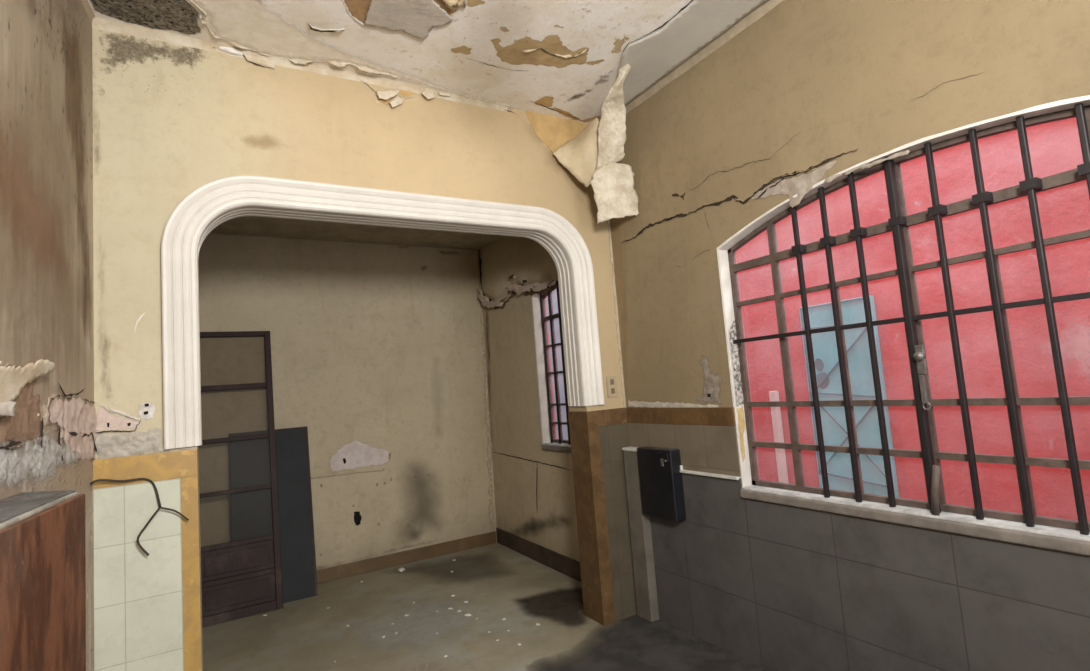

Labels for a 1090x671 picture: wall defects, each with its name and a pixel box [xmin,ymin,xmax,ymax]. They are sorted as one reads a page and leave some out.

peeling [342,0,485,41]
peeling [188,0,453,107]
flaking render [451,46,472,55]
peeling [491,0,767,106]
peeling [523,96,600,158]
crack [622,132,858,268]
spalling [0,359,193,464]
efflorescence [0,436,80,487]
peeling [329,439,391,473]
water stain [518,587,584,625]
water stain [536,614,768,671]